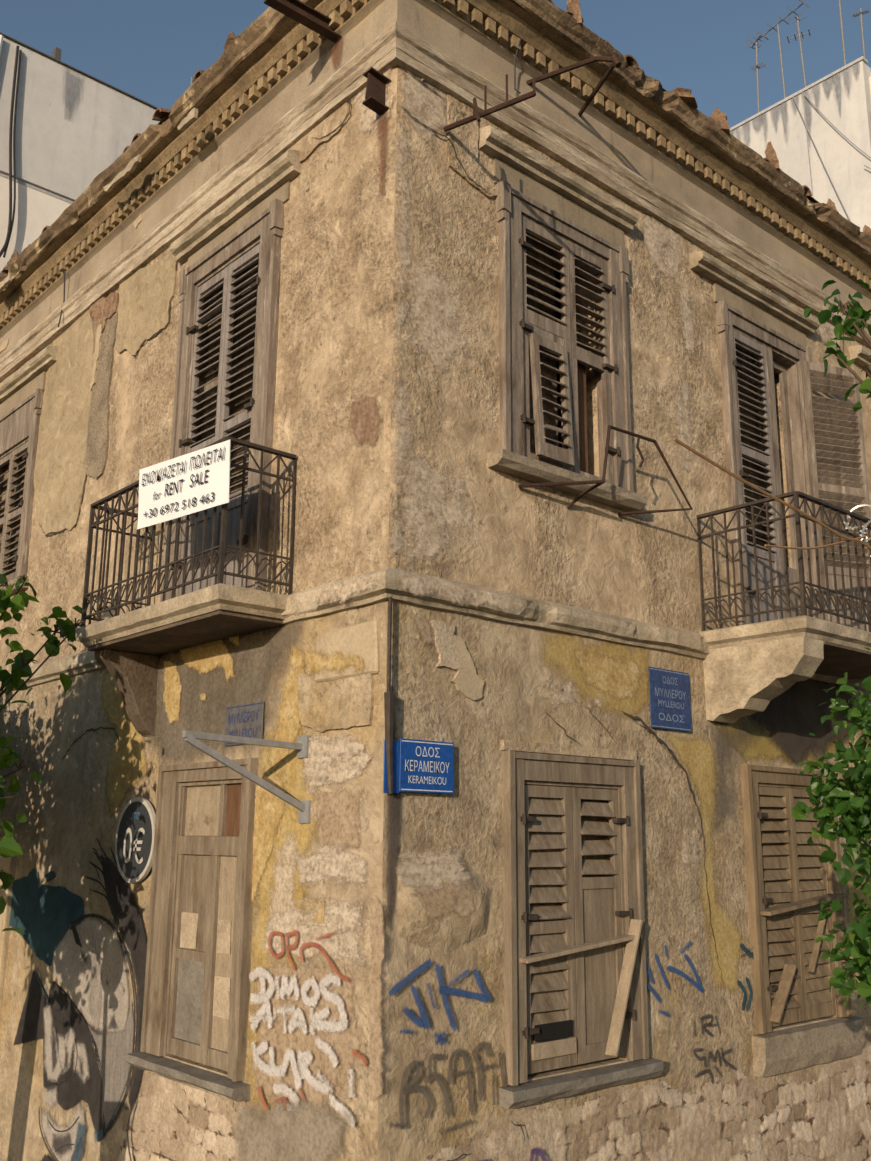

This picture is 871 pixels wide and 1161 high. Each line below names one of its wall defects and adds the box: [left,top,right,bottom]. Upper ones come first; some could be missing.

flaking render [286,69,498,198]
flaking render [33,253,178,537]
flaking render [398,453,512,613]
peeling [101,671,147,816]
peeling [163,635,239,724]
flaking render [413,616,484,700]
peeling [542,634,649,717]
flaking render [246,645,384,1111]
crack [544,682,724,985]
peeling [669,735,741,996]
flaking render [118,1070,240,1161]
flaking render [423,1045,871,1161]